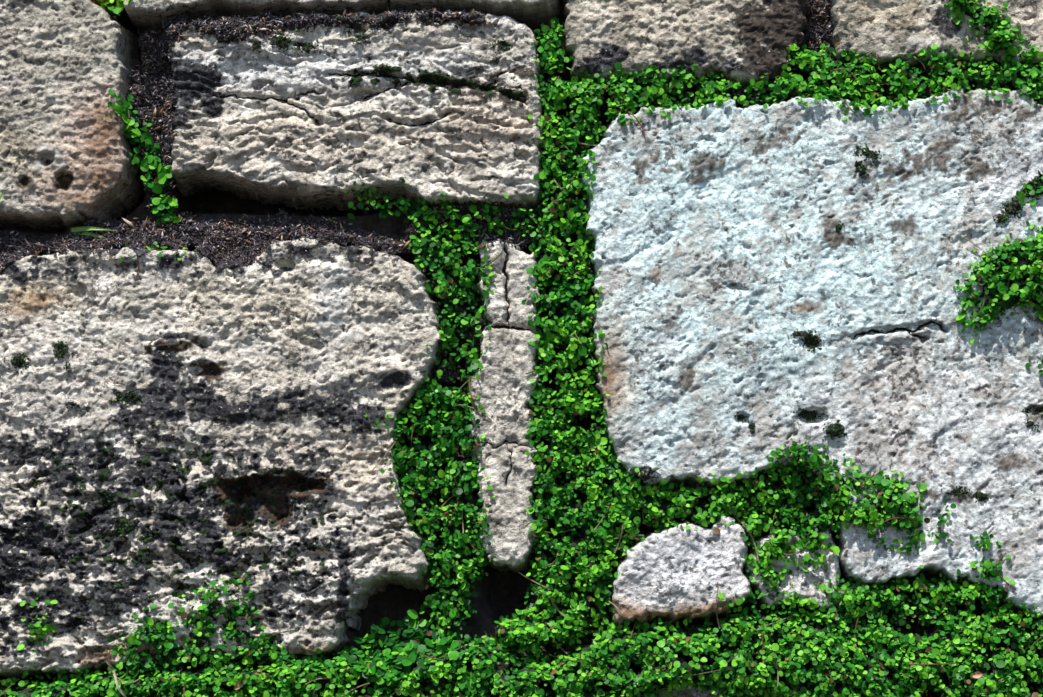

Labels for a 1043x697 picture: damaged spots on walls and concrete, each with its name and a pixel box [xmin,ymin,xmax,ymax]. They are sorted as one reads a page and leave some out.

crack [853,320,947,339]